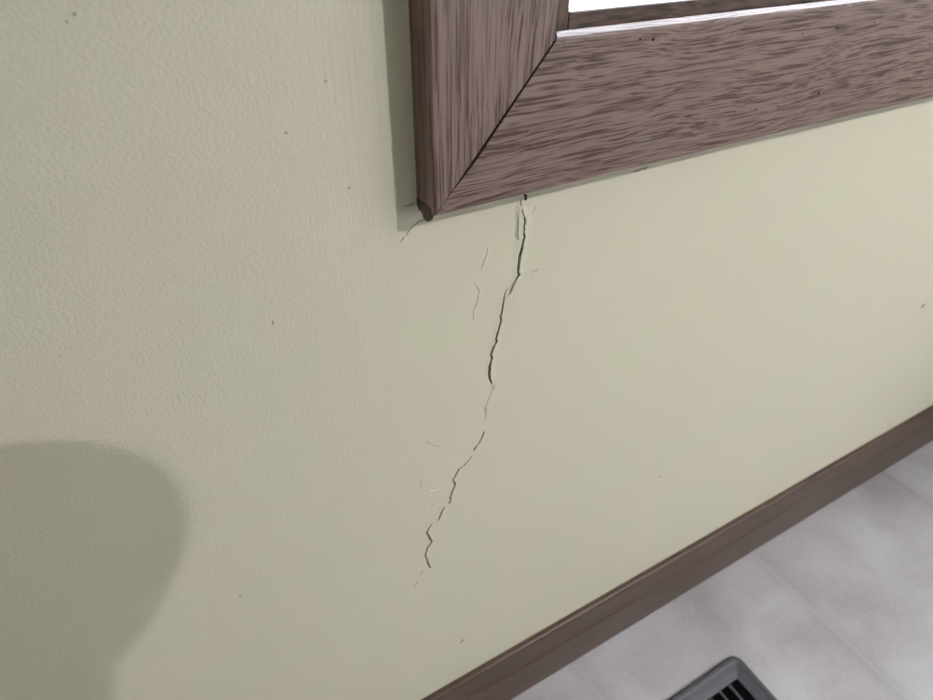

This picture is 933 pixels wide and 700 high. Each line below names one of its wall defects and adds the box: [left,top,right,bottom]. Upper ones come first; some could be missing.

crack [474,194,535,385]
crack [425,430,488,568]